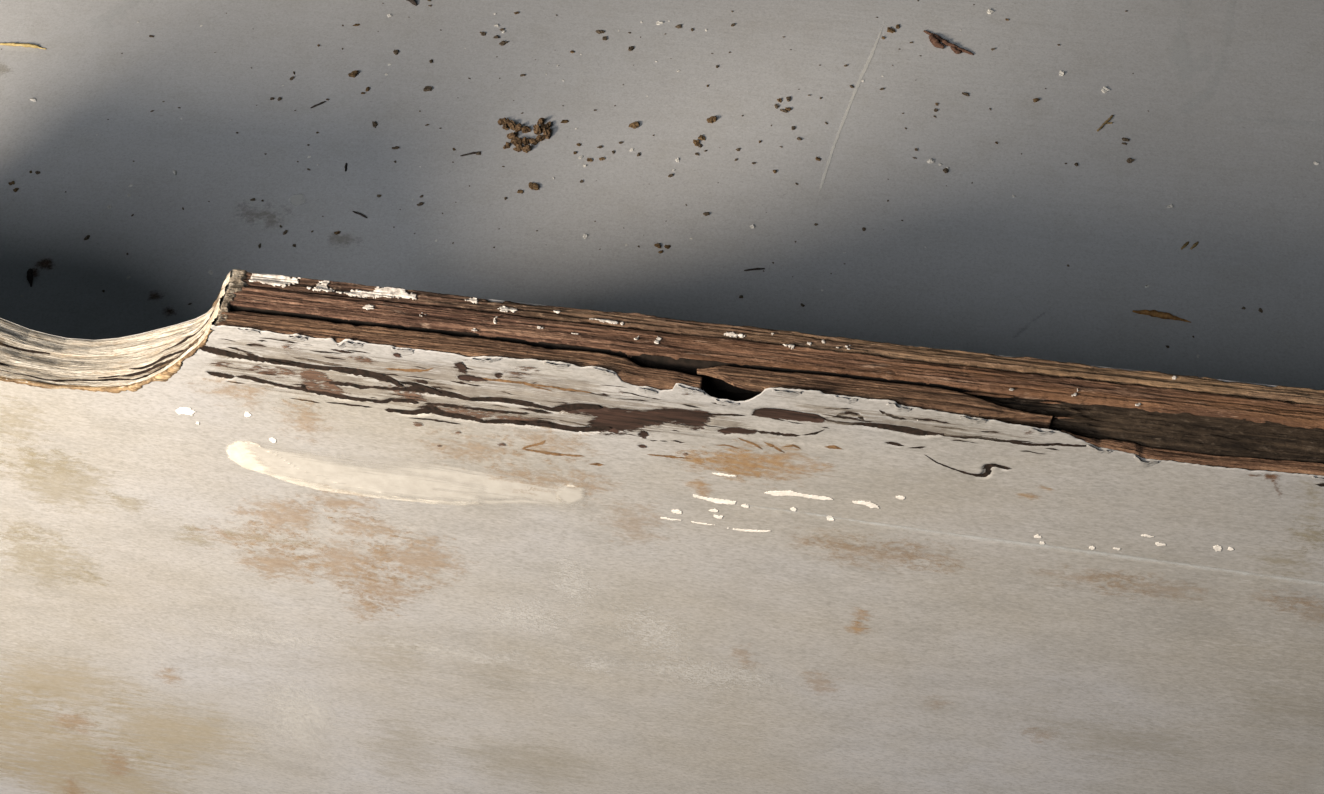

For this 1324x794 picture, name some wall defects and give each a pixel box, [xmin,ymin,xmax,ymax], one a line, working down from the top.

peeling [336,342,377,364]
peeling [391,347,414,358]
peeling [246,364,347,395]
peeling [454,358,569,382]
peeling [388,385,828,448]